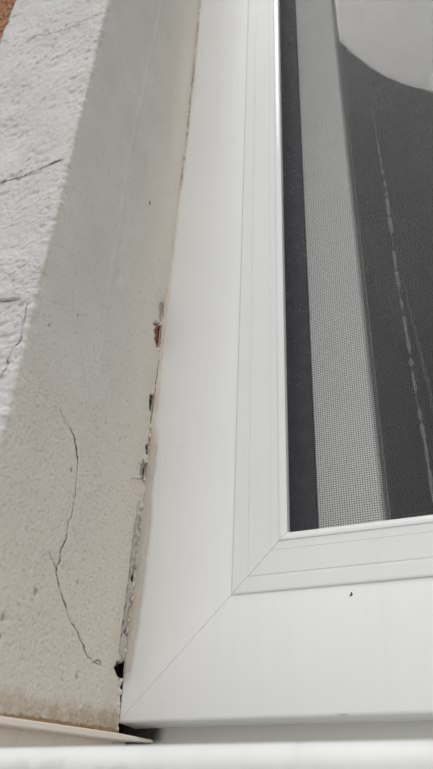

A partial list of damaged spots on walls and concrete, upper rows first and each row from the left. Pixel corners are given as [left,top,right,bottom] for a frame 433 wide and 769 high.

crack [49,410,101,665]